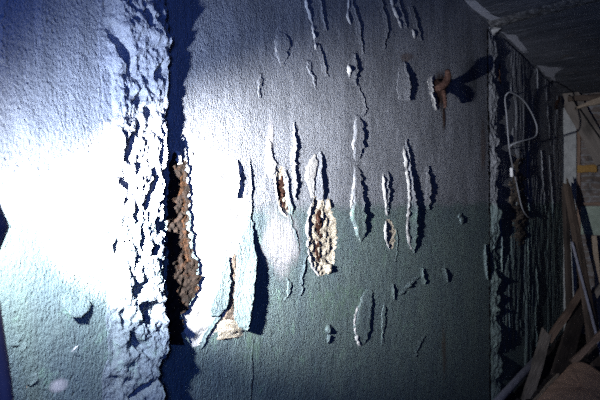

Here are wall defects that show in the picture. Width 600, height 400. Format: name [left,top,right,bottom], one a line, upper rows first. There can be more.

spalling [165,132,258,349]
spalling [265,122,338,276]
spalling [382,172,399,262]
peeling [498,32,563,366]